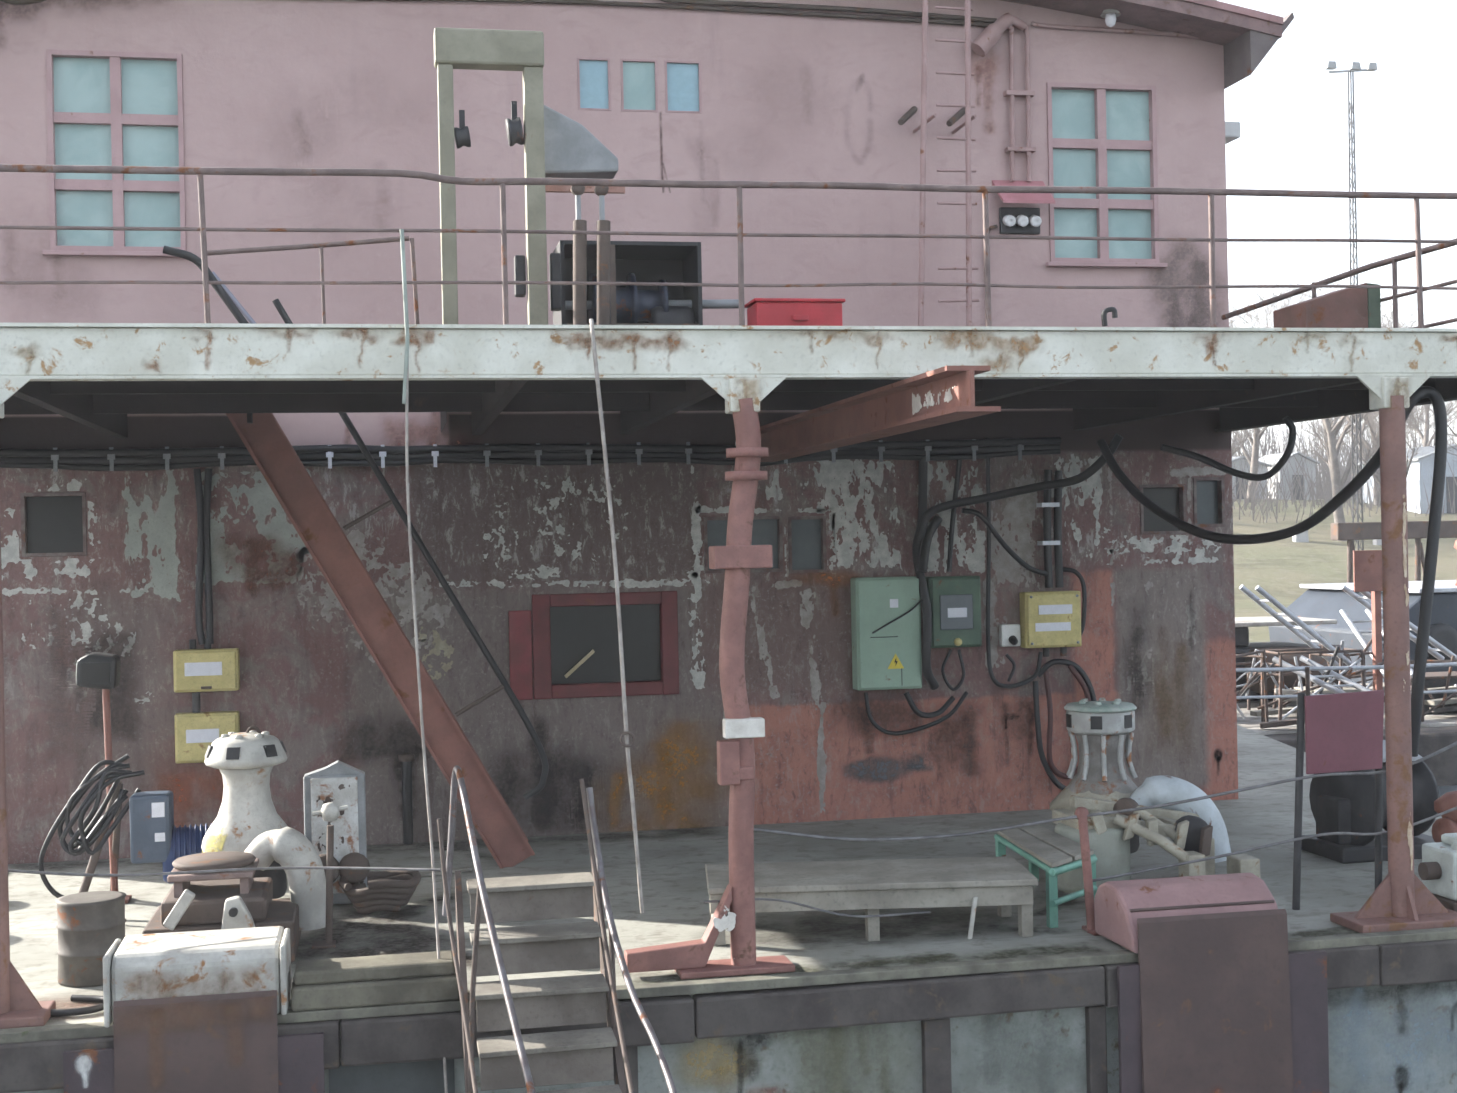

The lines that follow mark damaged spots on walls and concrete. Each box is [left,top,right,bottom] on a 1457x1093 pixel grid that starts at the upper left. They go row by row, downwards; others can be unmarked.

corrosion [397,332,433,344]
corrosion [570,333,681,369]
corrosion [944,330,1036,368]
peeling [1,478,136,712]
peeling [120,470,375,663]
peeling [346,475,729,689]
peeling [749,459,902,813]
peeling [917,453,1227,684]
peeling [845,755,925,782]